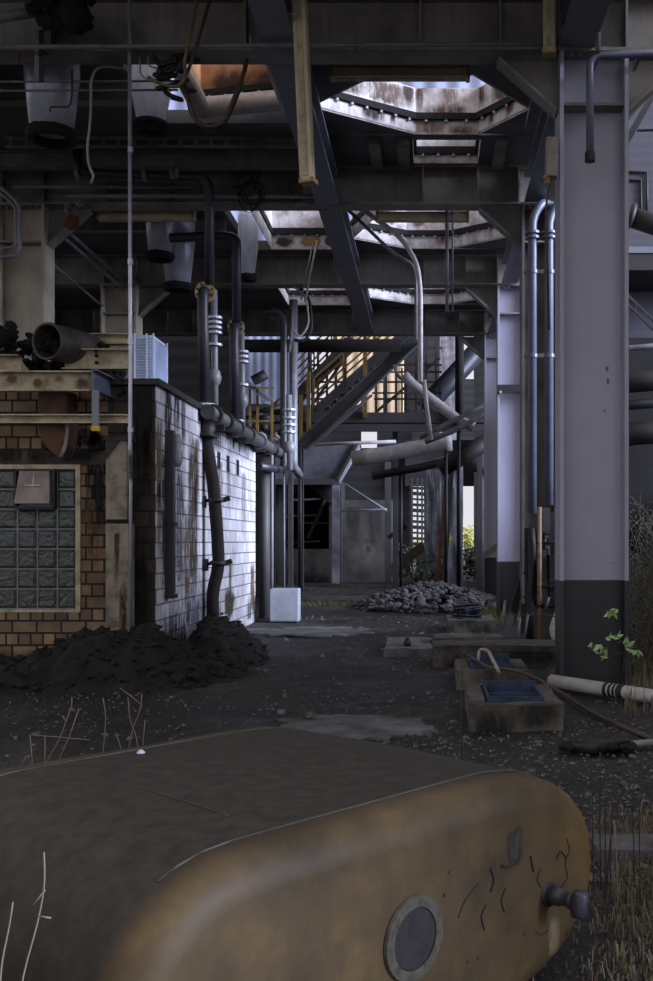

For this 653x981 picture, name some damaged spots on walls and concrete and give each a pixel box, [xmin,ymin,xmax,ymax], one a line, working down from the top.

rust [347,82,423,122]
rust [424,89,463,131]
rust [479,86,512,114]
damp [134,389,207,641]